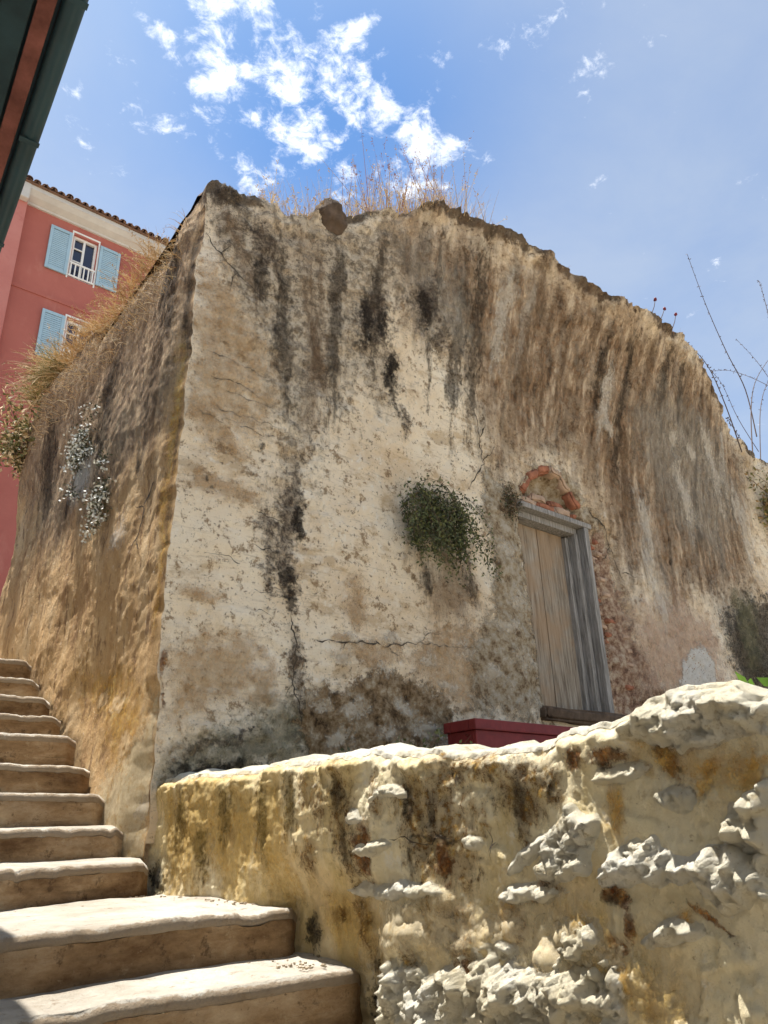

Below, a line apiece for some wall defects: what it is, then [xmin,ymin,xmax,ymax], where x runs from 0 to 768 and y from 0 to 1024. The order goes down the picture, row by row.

water stain [20,184,768,725]
crack [205,512,474,748]
spalling [287,459,664,755]